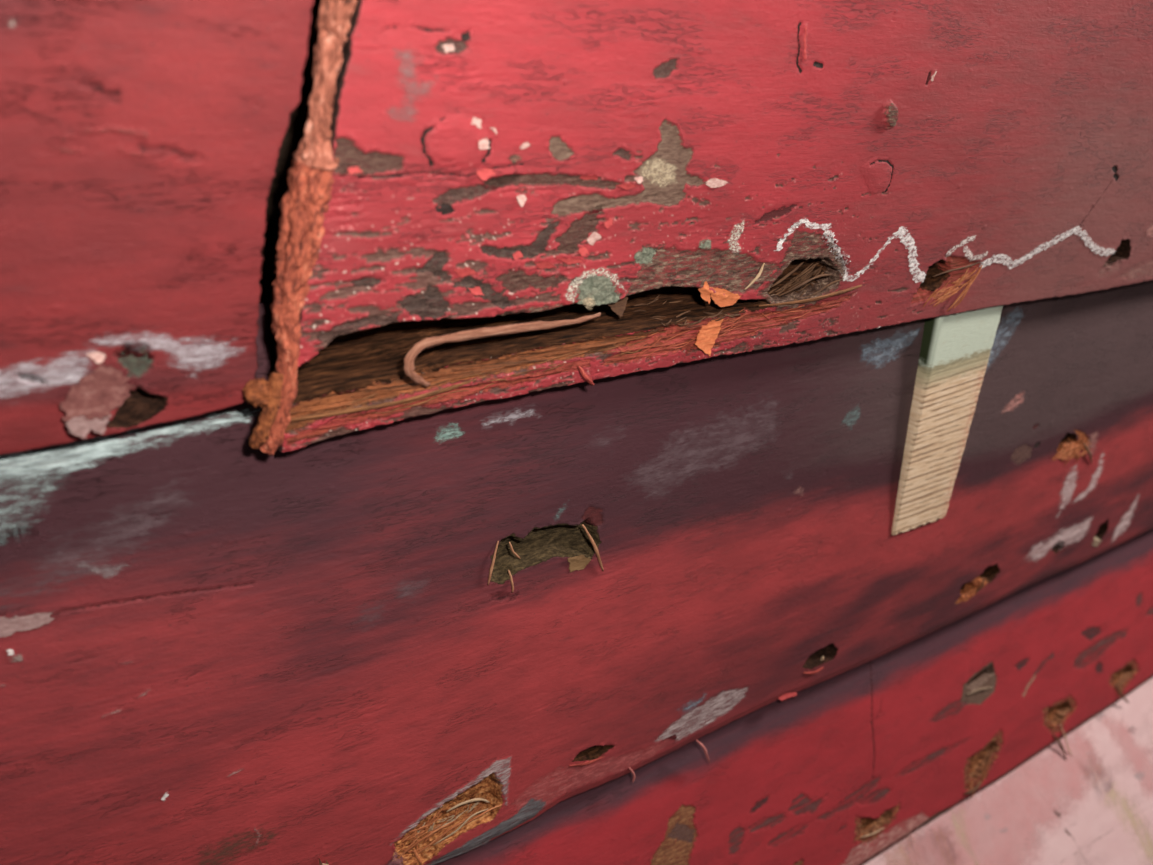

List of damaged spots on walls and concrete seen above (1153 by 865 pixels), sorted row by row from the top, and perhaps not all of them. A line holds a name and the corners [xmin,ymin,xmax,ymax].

spalling [292,120,840,405]
peeling [59,345,168,439]
spalling [1056,433,1077,452]
peeling [0,582,252,637]
hole [490,522,601,584]
hole [960,563,1000,594]
spalling [1094,519,1109,540]
spalling [803,643,839,669]
spalling [393,688,747,865]
peeling [861,626,1153,865]
peeling [728,778,893,854]